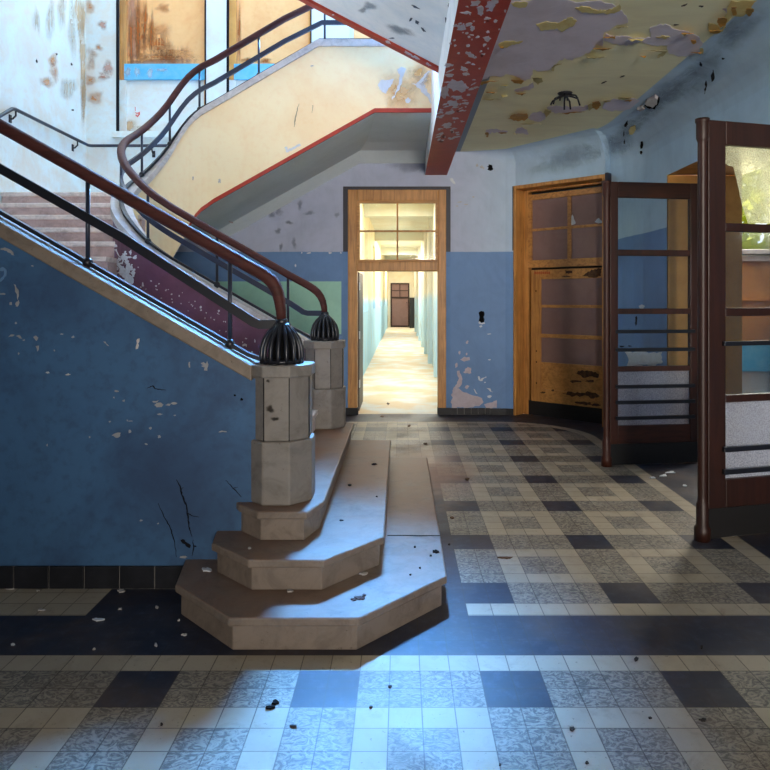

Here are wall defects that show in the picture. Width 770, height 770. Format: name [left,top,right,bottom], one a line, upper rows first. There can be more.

peeling [708,0,757,34]
peeling [378,67,406,100]
peeling [404,0,704,144]
peeling [114,244,227,332]
peeling [451,340,497,408]
crack [158,481,197,557]